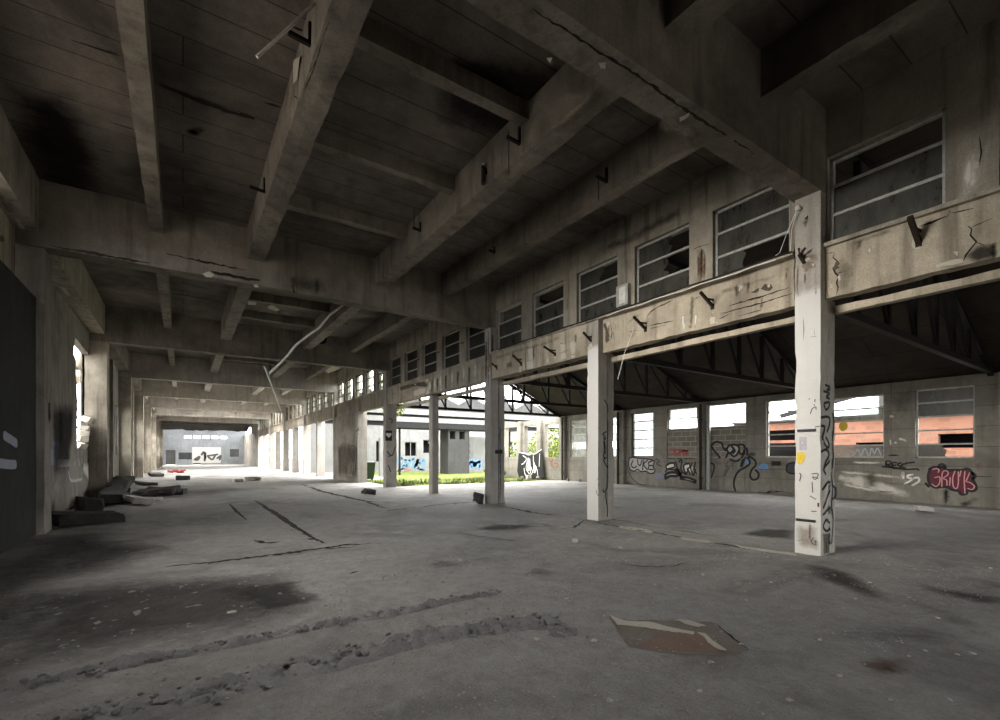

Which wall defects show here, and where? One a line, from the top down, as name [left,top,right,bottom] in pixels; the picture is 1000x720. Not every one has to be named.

crack [159,20,330,120]
crack [532,8,754,154]
damp [25,98,93,191]
crack [919,208,992,261]
crack [827,252,842,295]
crack [167,540,370,574]
damp [34,582,307,647]